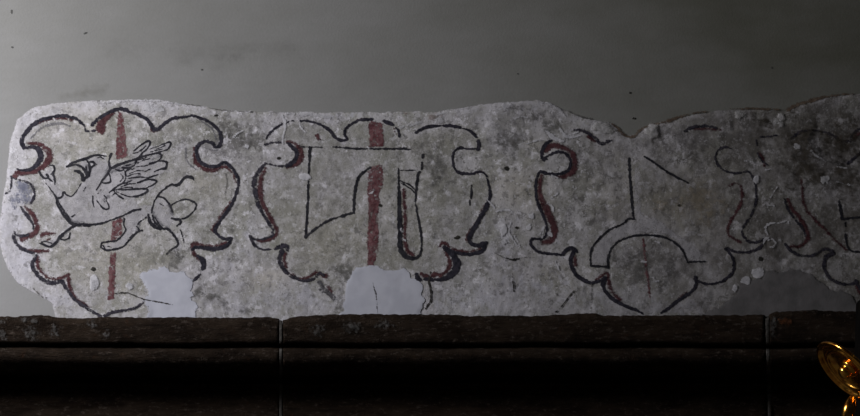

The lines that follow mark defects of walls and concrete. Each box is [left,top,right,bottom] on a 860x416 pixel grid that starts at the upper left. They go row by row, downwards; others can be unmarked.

flaking render [0,93,860,325]